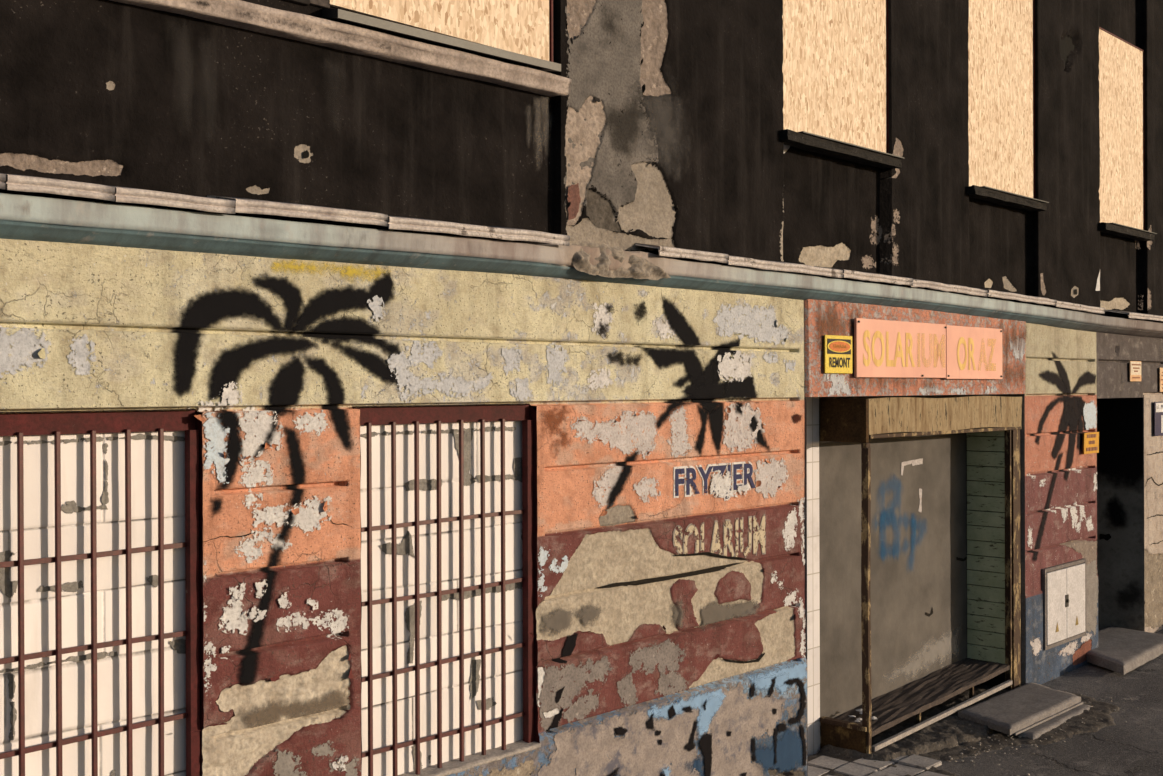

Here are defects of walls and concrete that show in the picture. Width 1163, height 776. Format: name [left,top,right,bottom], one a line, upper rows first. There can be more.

flaking render [639,0,671,97]
flaking render [565,96,679,251]
flaking render [799,209,900,270]
peeling [367,295,385,322]
peeling [387,337,533,403]
peeling [587,302,643,391]
peeling [713,303,796,382]
peeling [188,381,332,563]
flaking render [528,401,806,688]
flaking render [1046,502,1097,565]
flaking render [192,579,353,776]
flaking render [538,667,559,718]